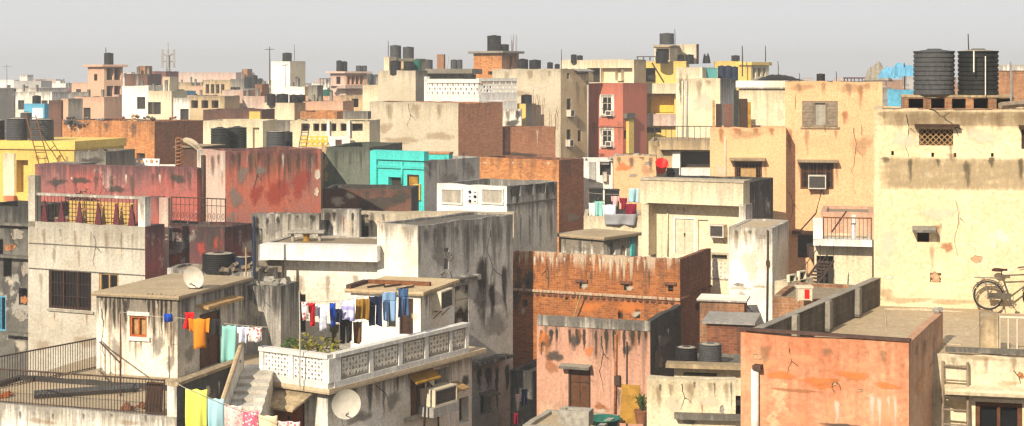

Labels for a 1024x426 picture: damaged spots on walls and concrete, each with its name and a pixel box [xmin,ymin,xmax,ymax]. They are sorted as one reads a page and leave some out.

crack [905,108,963,155]
water stain [49,177,89,187]
water stain [110,175,134,193]
water stain [152,173,191,183]
spalling [5,228,24,251]
water stain [424,184,650,322]
water stain [540,319,677,372]